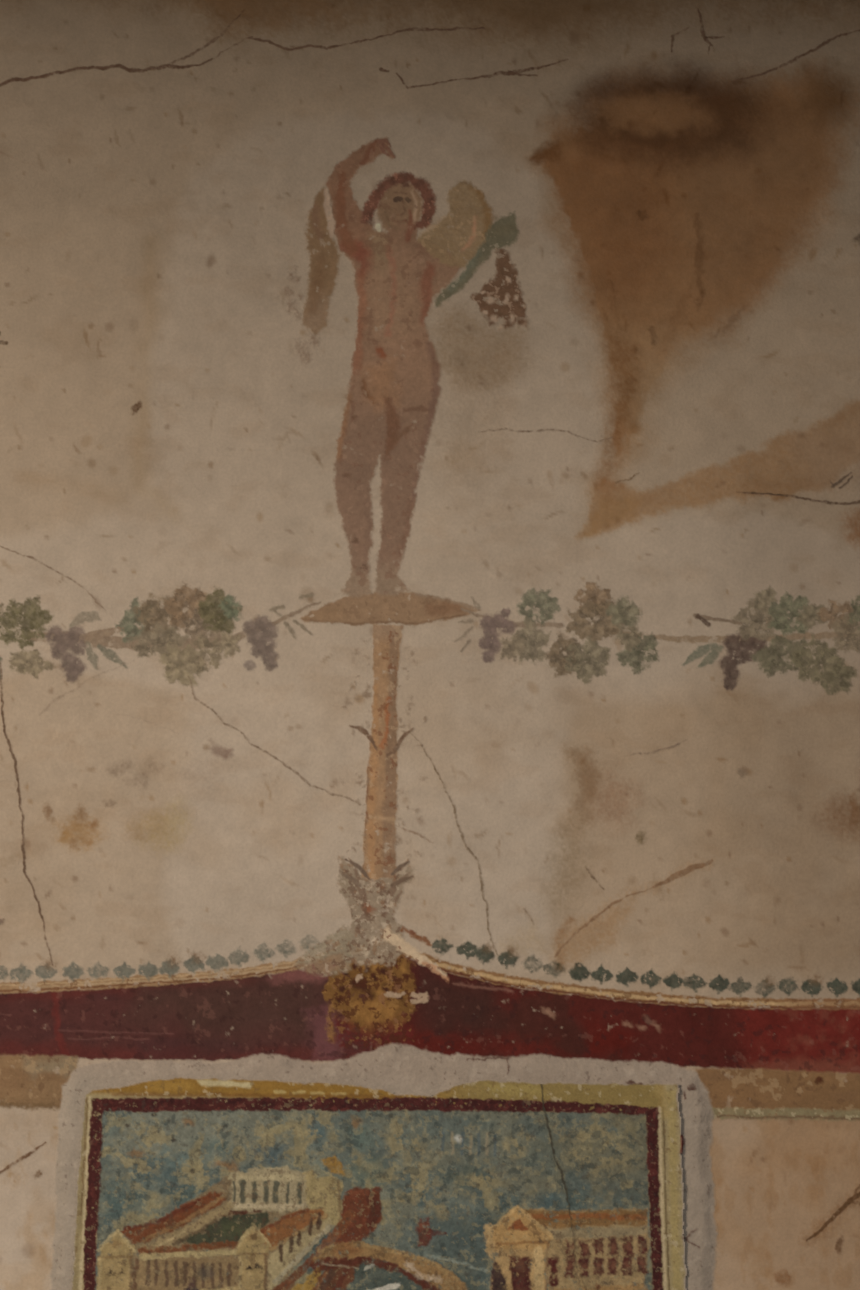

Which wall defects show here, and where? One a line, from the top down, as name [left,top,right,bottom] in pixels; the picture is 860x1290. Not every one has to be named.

crack [0,8,569,90]
water stain [0,0,860,545]
crack [0,545,107,612]
crack [186,675,362,806]
crack [0,660,54,967]
crack [394,730,499,956]
crack [522,857,717,963]
crack [0,1141,47,1175]